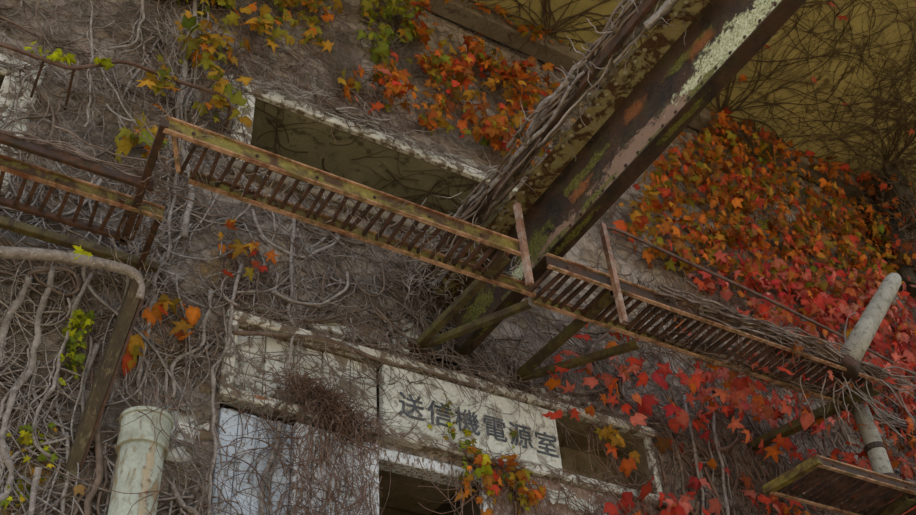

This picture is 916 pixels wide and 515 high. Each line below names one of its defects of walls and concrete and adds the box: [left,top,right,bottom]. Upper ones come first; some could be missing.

corrosion [531,69,711,268]